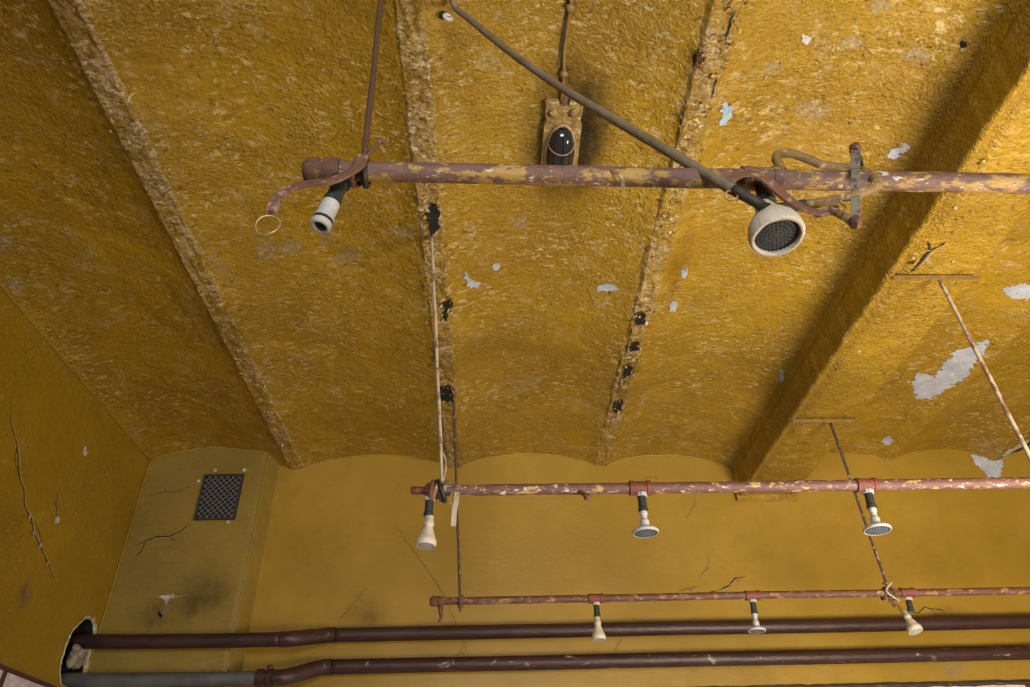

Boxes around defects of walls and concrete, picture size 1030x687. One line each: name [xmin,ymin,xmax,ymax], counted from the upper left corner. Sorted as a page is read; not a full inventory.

peeling [686,1,748,85]
peeling [675,101,737,152]
peeling [884,143,910,159]
peeling [1001,283,1030,300]
peeling [912,339,989,402]
peeling [970,439,1030,478]
crack [10,404,60,582]
crack [135,526,187,558]